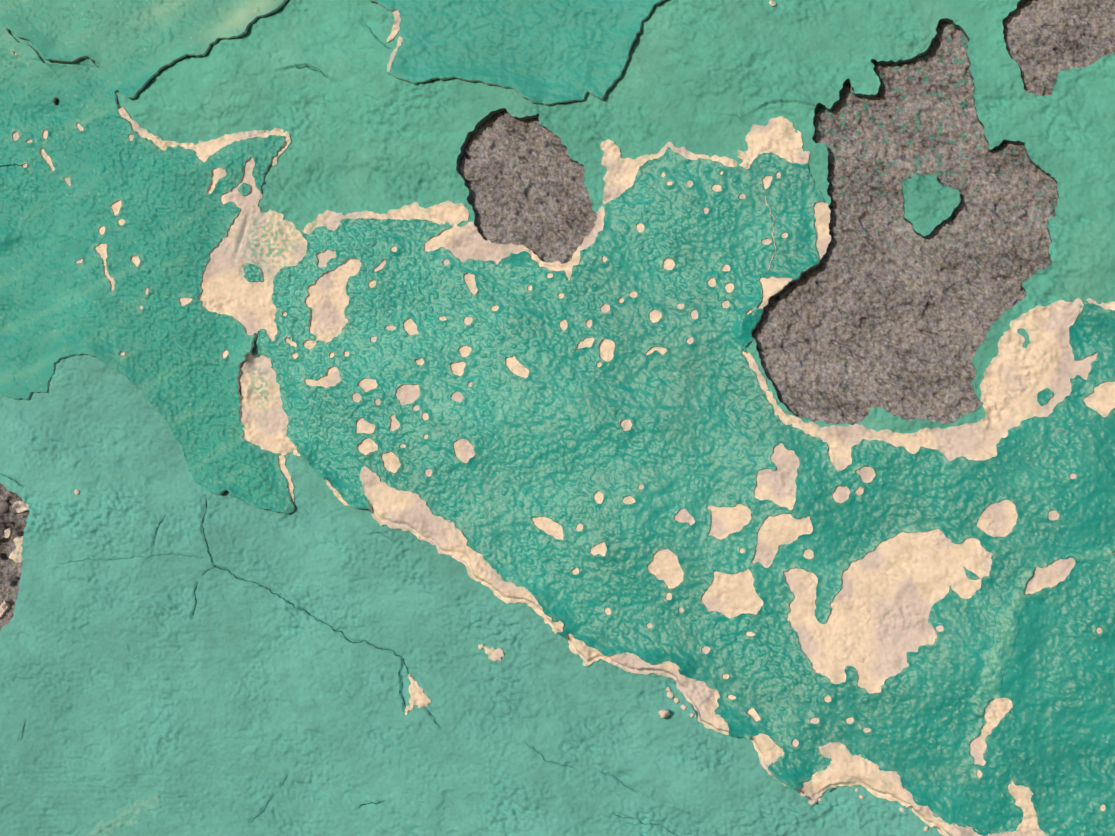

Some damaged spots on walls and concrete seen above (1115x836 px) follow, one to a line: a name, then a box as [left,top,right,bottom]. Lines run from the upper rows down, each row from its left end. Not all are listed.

spalling [1002,0,1115,96]
peeling [0,0,307,514]
peeling [257,22,1115,836]
spalling [0,483,29,631]
crack [67,497,441,729]